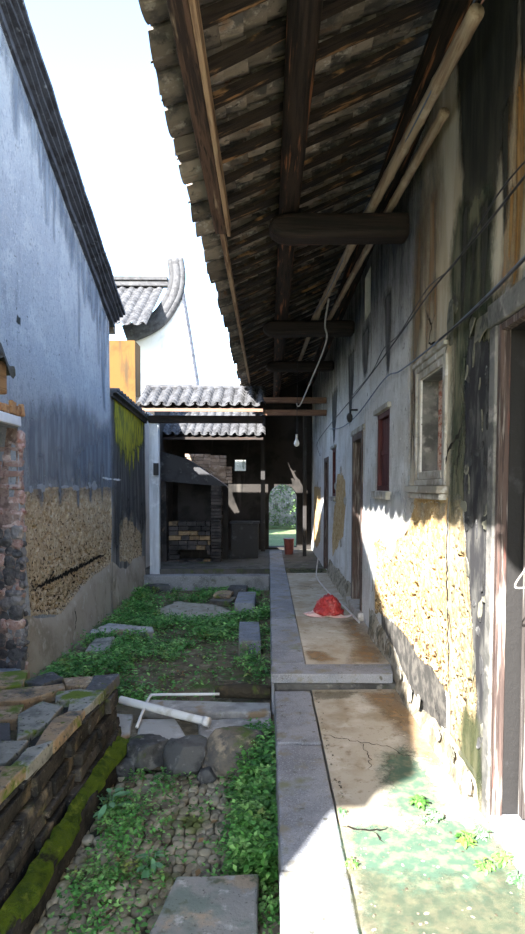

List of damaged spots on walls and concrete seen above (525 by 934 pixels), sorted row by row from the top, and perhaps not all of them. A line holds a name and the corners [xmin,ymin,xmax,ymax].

damp [0,23,146,551]
damp [410,0,525,514]
spalling [24,481,143,617]
spalling [313,482,321,547]
spalling [332,467,346,556]
damp [370,493,404,546]
spalling [371,312,490,782]
crack [323,734,425,770]